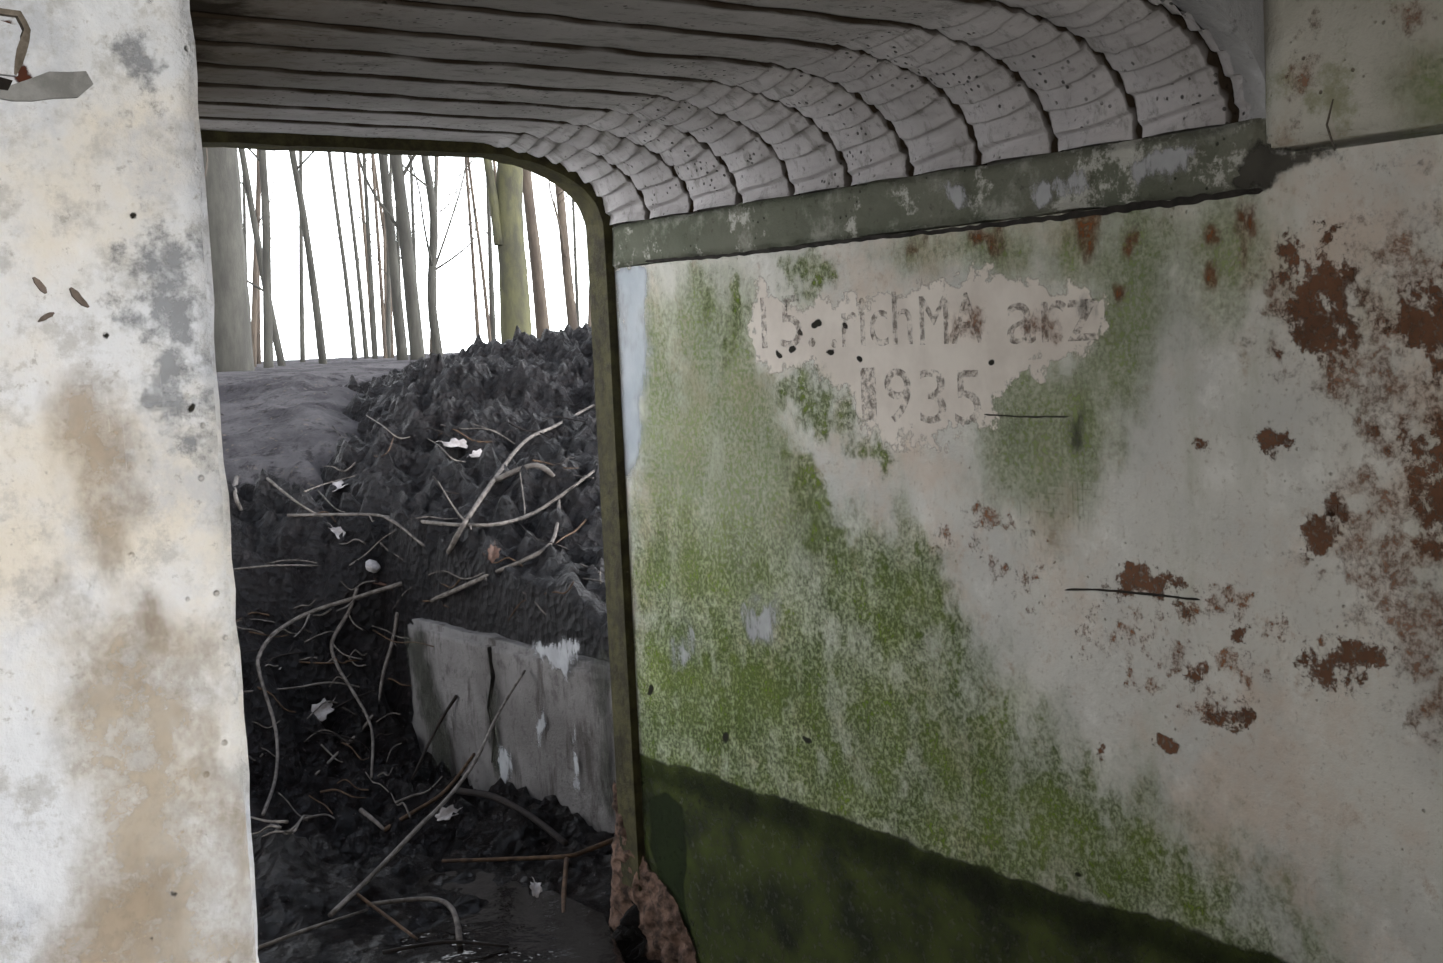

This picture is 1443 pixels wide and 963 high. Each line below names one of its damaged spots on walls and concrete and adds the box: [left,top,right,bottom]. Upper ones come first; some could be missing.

spalling [0,8,93,102]
water stain [615,266,646,473]
water stain [671,628,695,666]
water stain [741,597,776,644]
water stain [640,754,1286,963]